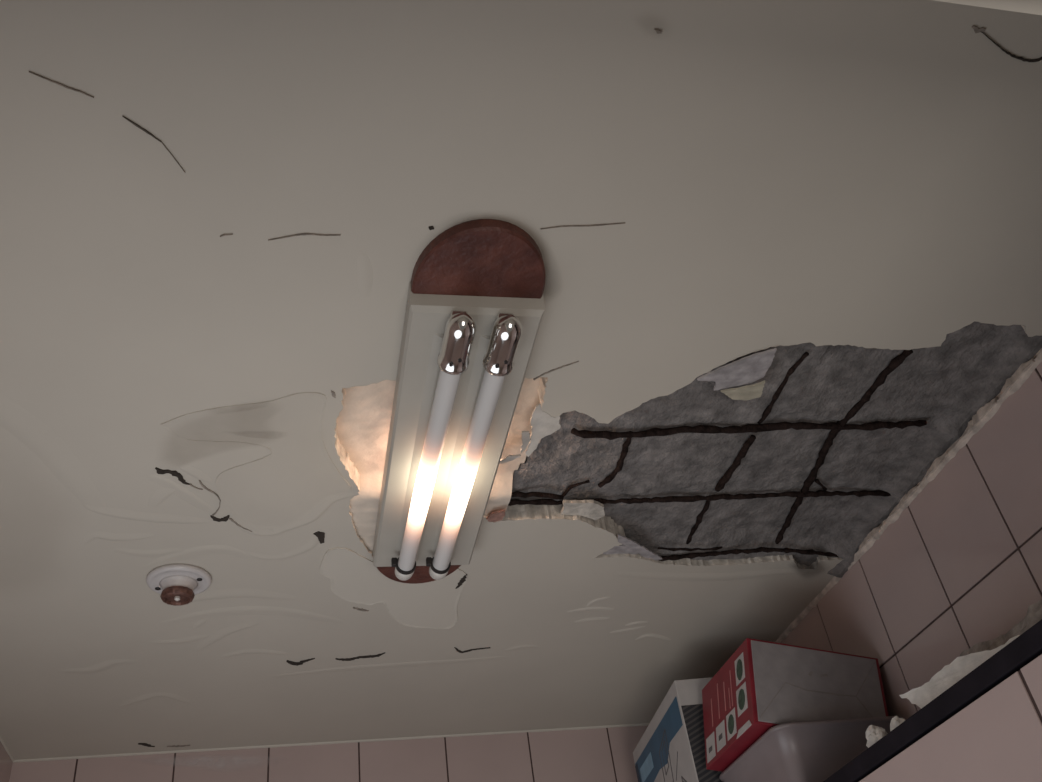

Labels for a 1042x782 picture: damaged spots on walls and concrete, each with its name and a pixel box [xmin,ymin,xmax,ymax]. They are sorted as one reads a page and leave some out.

crack [29,71,94,98]
crack [122,115,185,172]
crack [268,233,341,241]
crack [540,221,626,229]
spalling [484,321,1042,578]
crack [155,467,252,532]
flaking render [313,380,467,629]
crack [286,652,385,666]